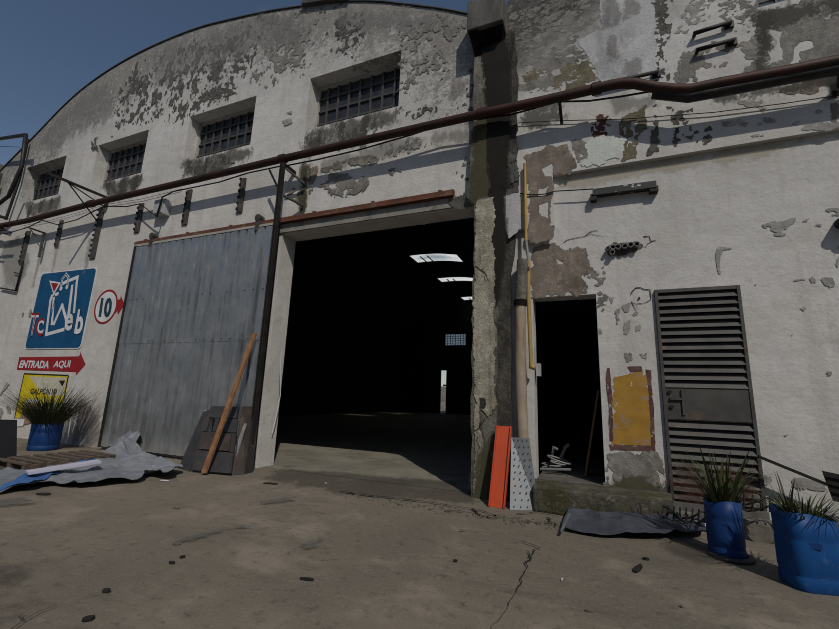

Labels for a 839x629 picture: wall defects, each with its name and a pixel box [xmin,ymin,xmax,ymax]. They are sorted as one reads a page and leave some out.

leakage [302,107,400,150]
peeling [619,104,713,162]
peeling [722,99,776,137]
peeling [287,137,432,202]
peeling [503,139,643,335]
peeling [762,218,822,236]
peeling [794,276,835,288]